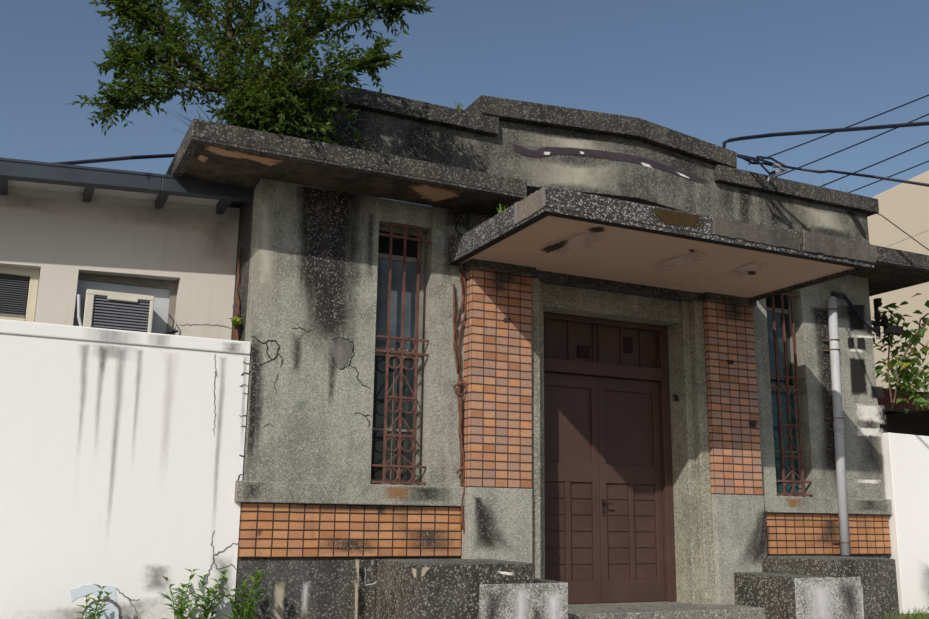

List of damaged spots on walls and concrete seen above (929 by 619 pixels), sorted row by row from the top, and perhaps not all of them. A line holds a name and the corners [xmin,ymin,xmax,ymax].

flaking render [197,146,283,166]
damp [303,187,359,333]
crack [211,354,219,431]
crack [239,326,315,428]
crack [207,530,239,579]
damp [475,497,498,543]